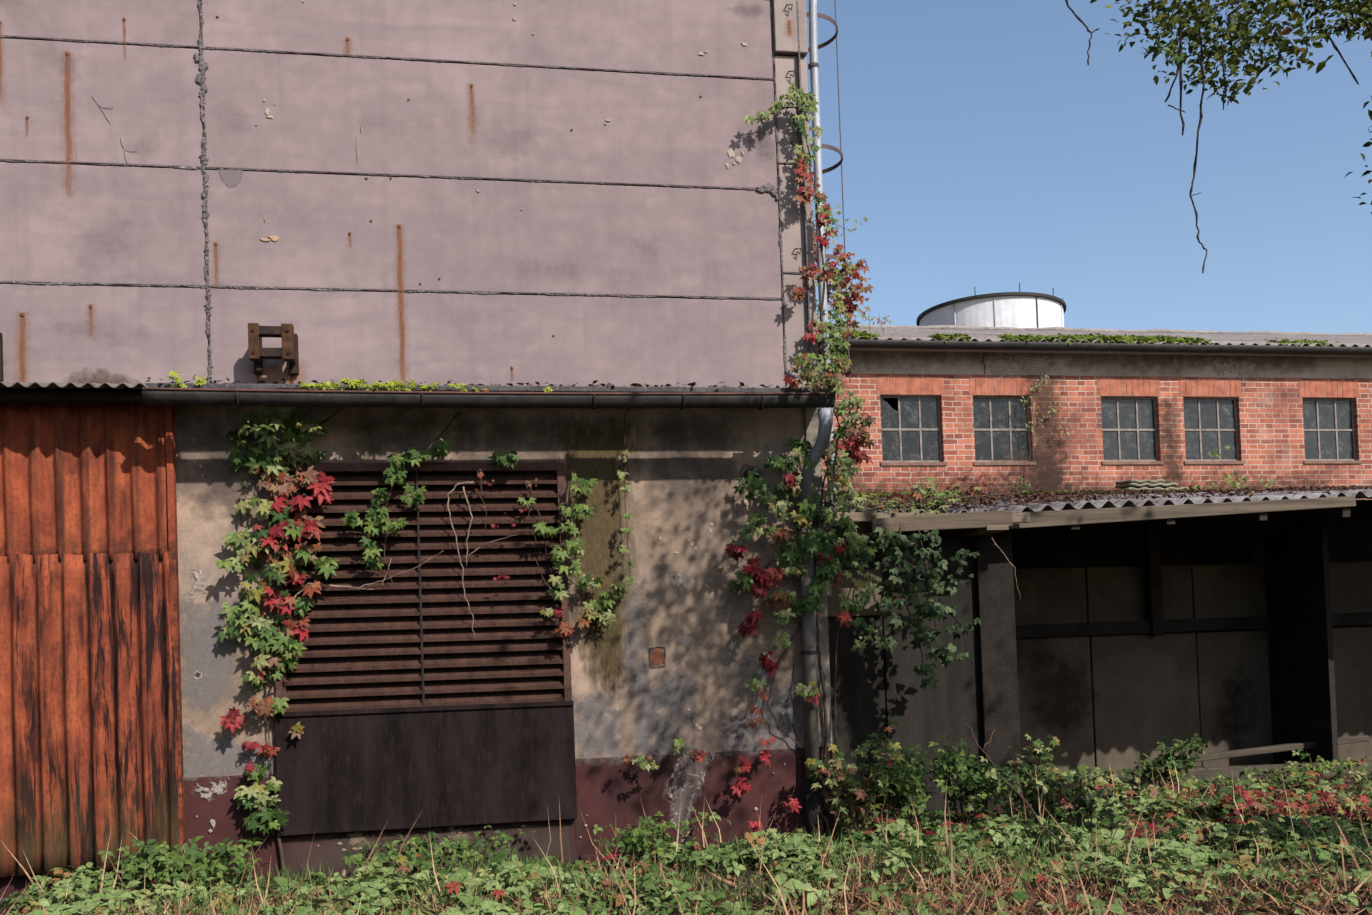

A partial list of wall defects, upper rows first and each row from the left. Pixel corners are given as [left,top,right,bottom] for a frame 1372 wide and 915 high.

rust [397,225,441,384]
damp [655,423,734,512]